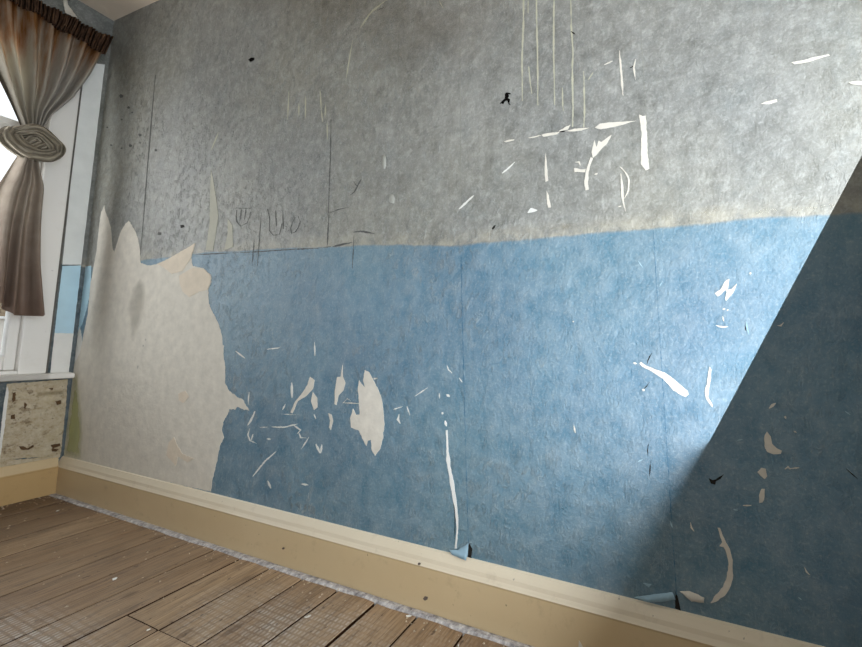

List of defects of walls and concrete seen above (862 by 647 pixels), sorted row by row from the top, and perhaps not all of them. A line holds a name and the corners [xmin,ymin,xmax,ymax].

flaking render [0,379,68,467]